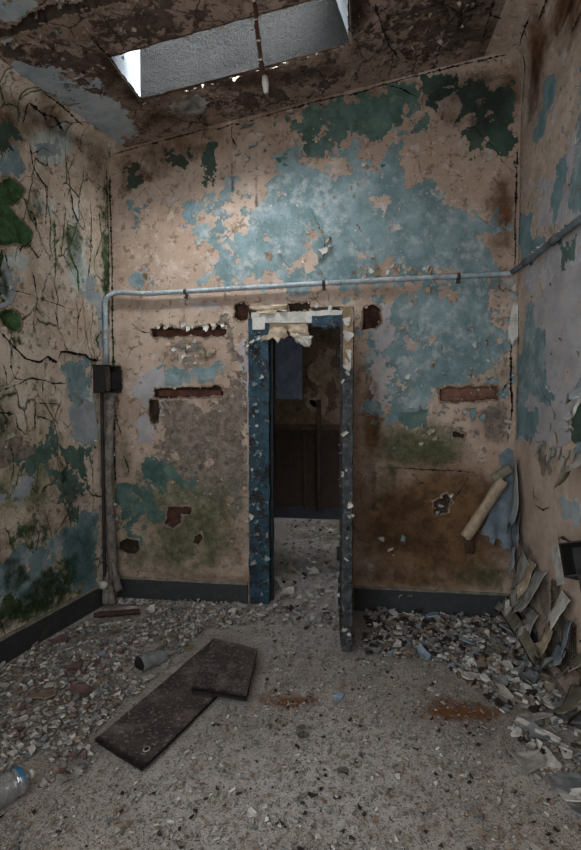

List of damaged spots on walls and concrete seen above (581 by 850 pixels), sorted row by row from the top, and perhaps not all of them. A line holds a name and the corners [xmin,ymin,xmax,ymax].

peeling [120,162,144,189]
peeling [0,300,269,610]
peeling [128,266,154,294]
crack [0,0,547,491]
peeling [142,44,581,749]